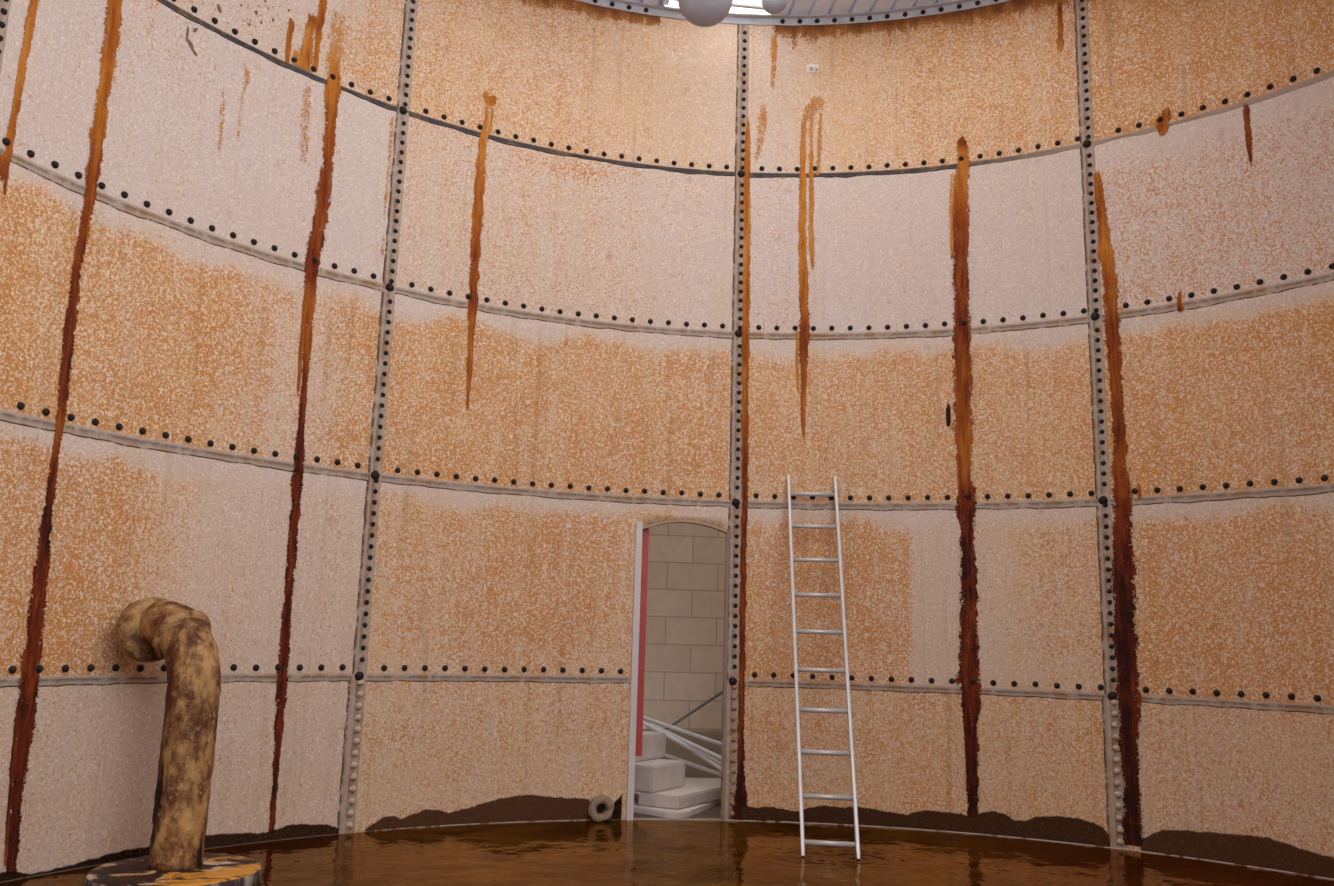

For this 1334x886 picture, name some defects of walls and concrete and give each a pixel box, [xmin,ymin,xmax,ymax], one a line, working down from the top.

rust [0,0,123,872]
rust [218,63,251,149]
rust [269,0,347,831]
rust [466,91,499,409]
rust [729,104,767,819]
rust [795,96,825,437]
rust [946,135,982,832]
rust [1093,170,1145,846]
rust [1153,107,1171,136]
rust [1243,105,1253,165]